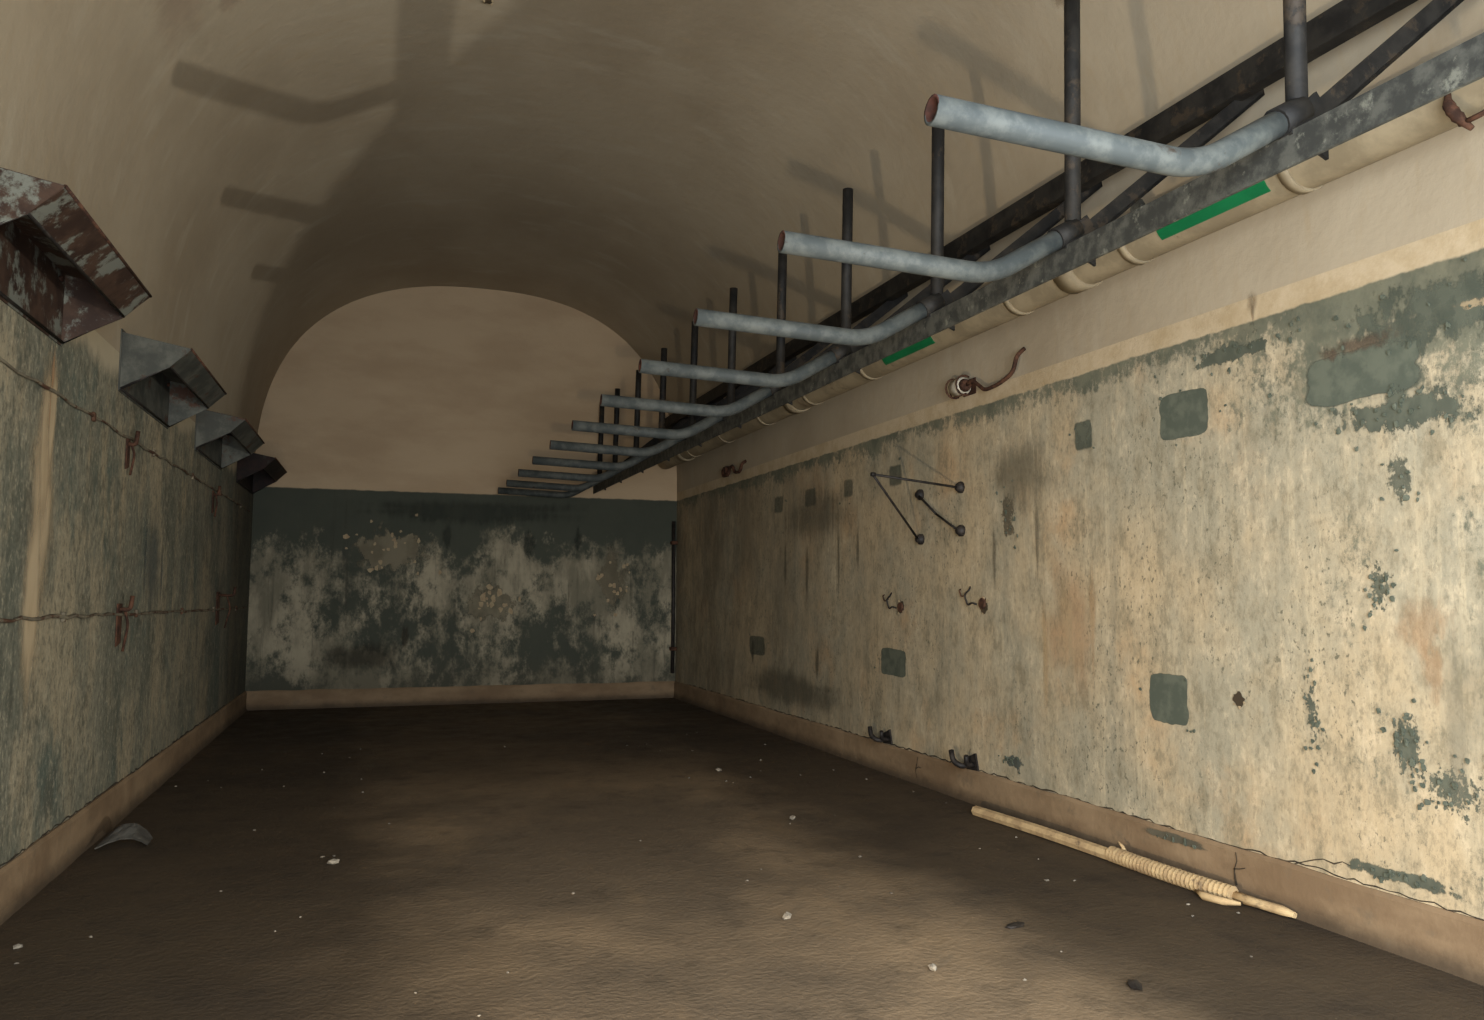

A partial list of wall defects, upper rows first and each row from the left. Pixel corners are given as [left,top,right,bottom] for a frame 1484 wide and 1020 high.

peeling [1324,257,1484,357]